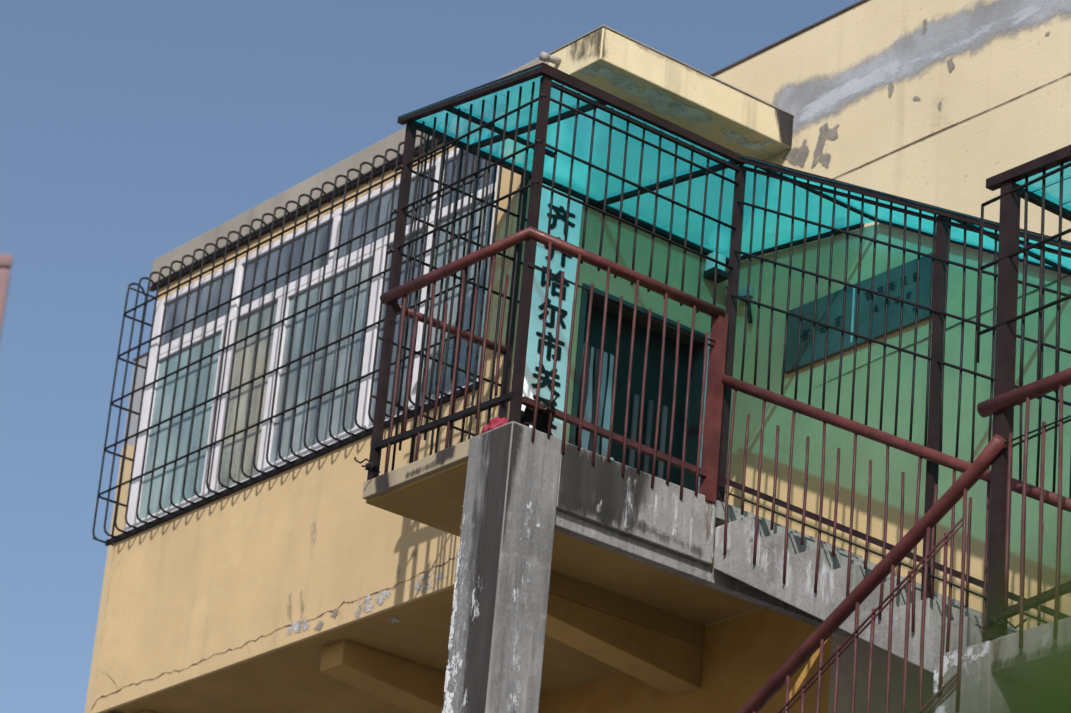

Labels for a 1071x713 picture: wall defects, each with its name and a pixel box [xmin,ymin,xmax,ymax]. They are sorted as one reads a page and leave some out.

peeling [782,123,839,169]
damp [558,443,659,531]
damp [663,494,678,536]
damp [689,504,715,557]
crack [92,549,455,708]
peeling [287,608,338,634]
peeling [355,590,392,617]
peeling [415,515,479,713]
peeling [507,501,540,713]